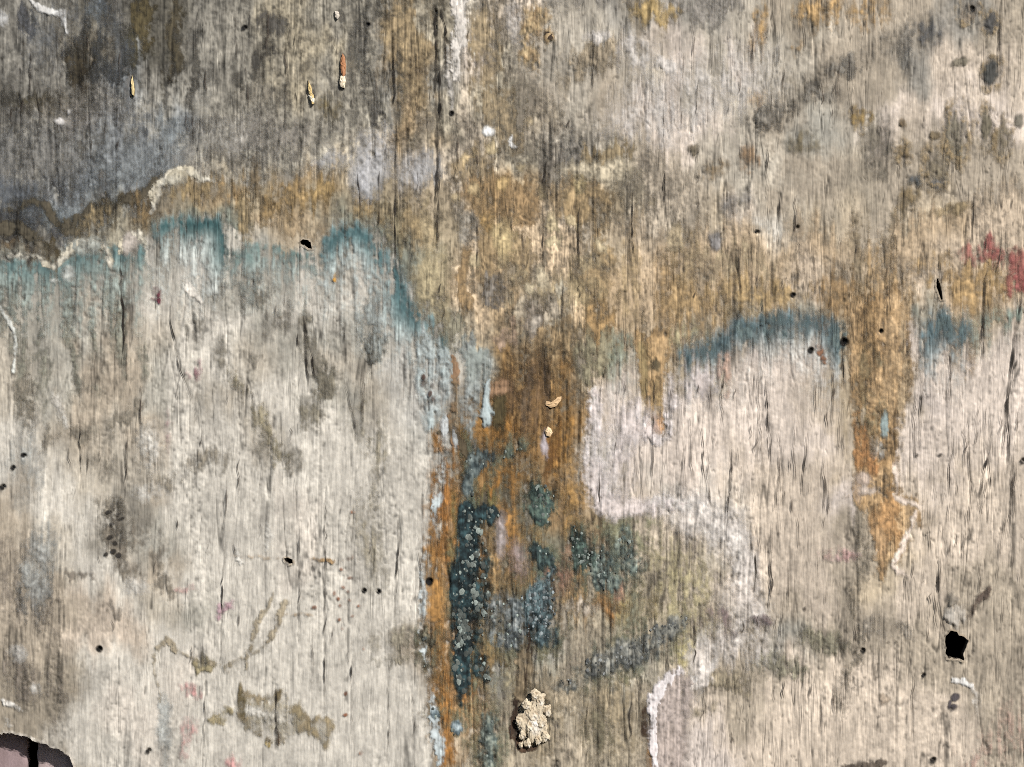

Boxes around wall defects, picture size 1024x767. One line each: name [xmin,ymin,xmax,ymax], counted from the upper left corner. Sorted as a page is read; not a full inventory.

corrosion [415,361,625,767]
water stain [431,441,771,767]
corrosion [845,284,922,580]